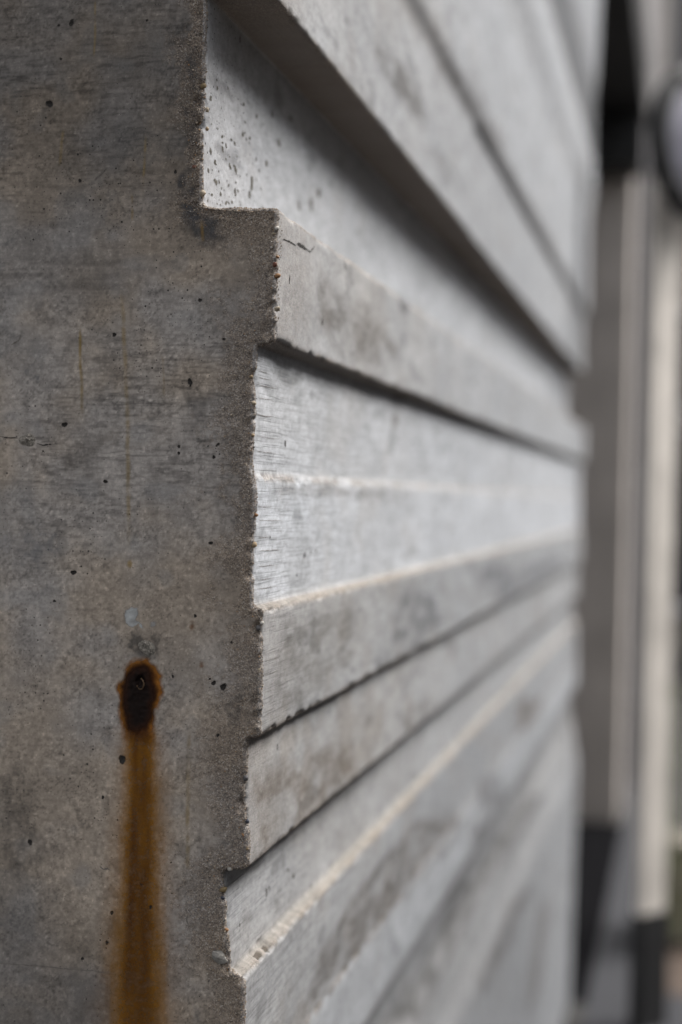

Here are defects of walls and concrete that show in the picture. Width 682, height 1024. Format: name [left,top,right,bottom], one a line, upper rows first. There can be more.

corrosion [114,659,164,1024]